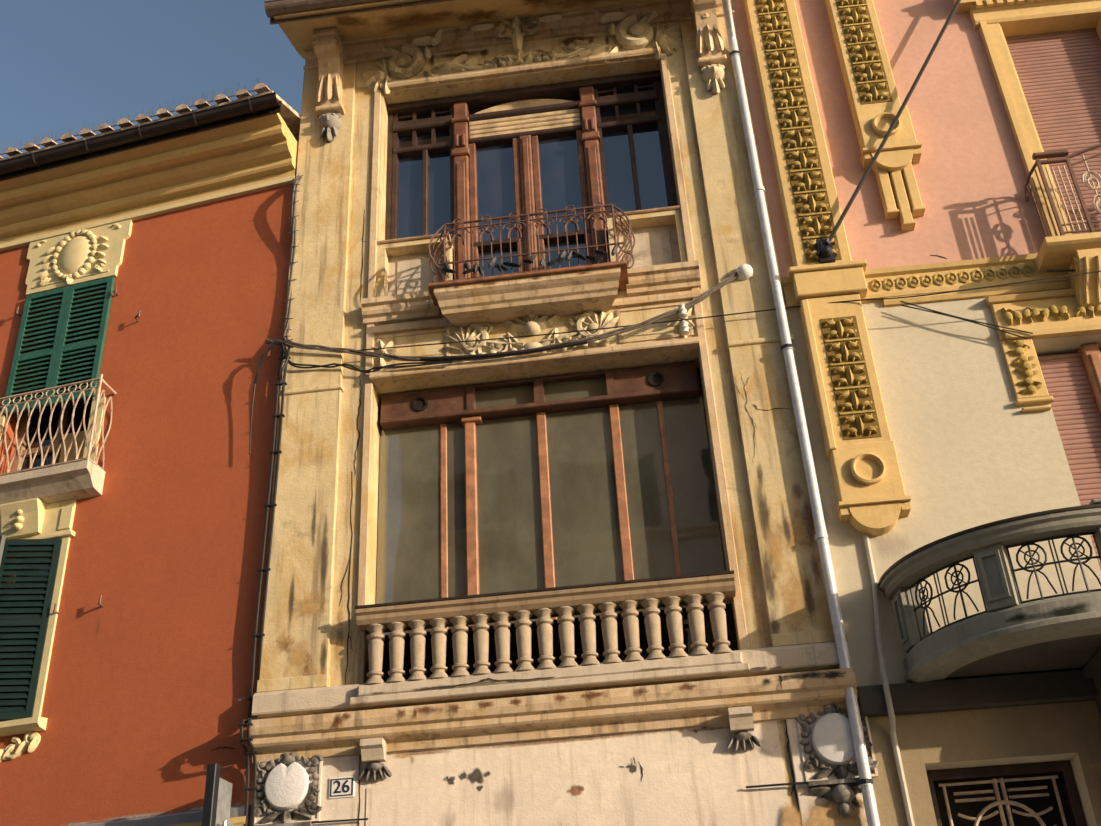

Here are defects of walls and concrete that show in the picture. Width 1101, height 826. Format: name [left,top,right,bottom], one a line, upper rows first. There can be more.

crack [735,372,787,461]
damp [290,502,327,621]
damp [749,468,814,639]
damp [278,611,343,676]
corrosion [398,707,435,718]
spalling [446,768,491,791]